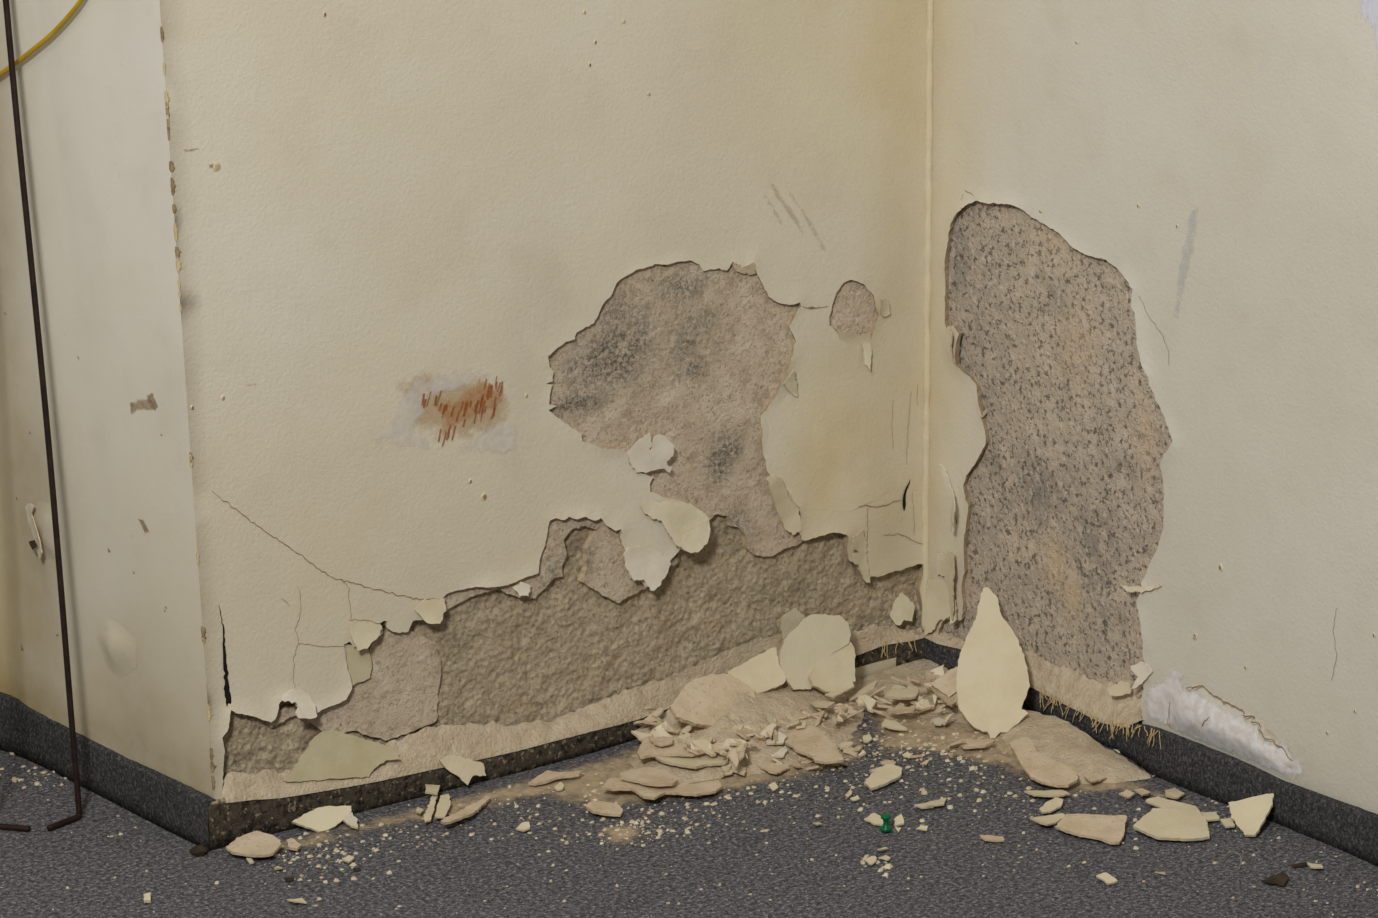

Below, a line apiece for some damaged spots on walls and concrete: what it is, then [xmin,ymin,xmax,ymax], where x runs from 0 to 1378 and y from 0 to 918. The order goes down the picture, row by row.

spalling [169,161,182,312]
corrosion [412,376,503,447]
flaking render [205,201,1303,790]
crack [217,495,433,684]
crack [219,607,231,706]
peeling [423,754,486,824]
peeling [586,745,790,817]